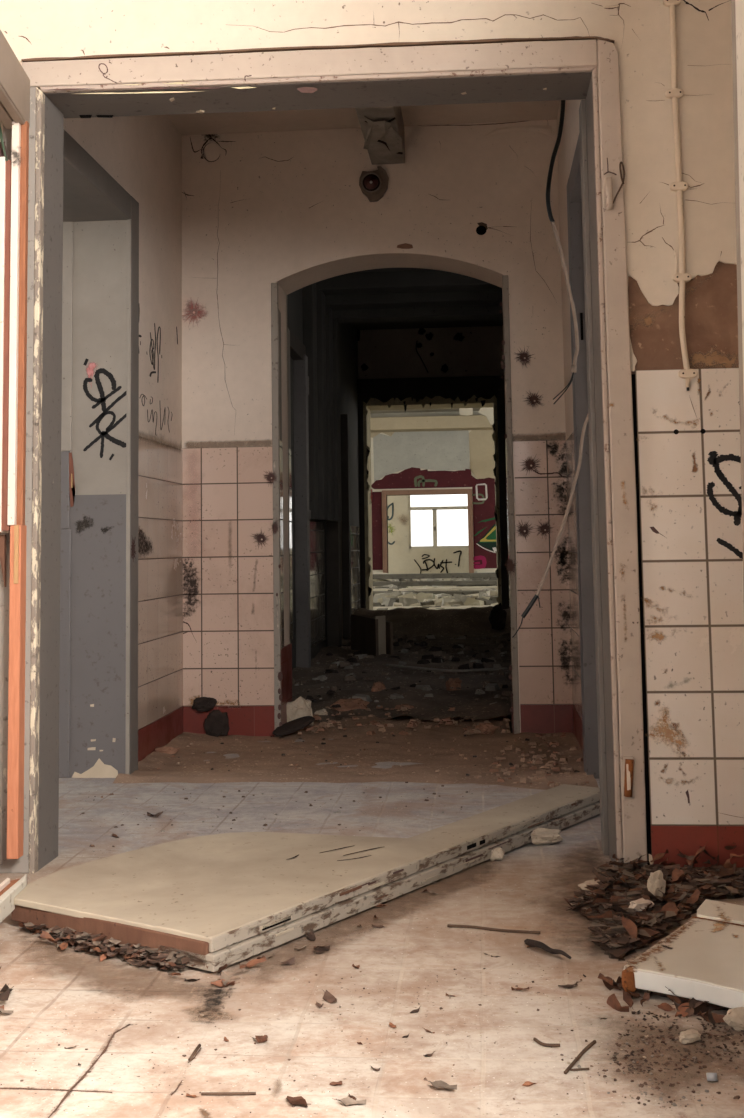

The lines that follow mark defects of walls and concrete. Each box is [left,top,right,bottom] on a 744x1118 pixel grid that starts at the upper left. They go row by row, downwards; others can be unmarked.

crack [240,3,641,47]
crack [683,0,731,21]
crack [632,173,717,250]
crack [182,134,246,432]
spalling [628,251,739,372]
peeling [72,738,118,778]
crack [0,1024,131,1118]